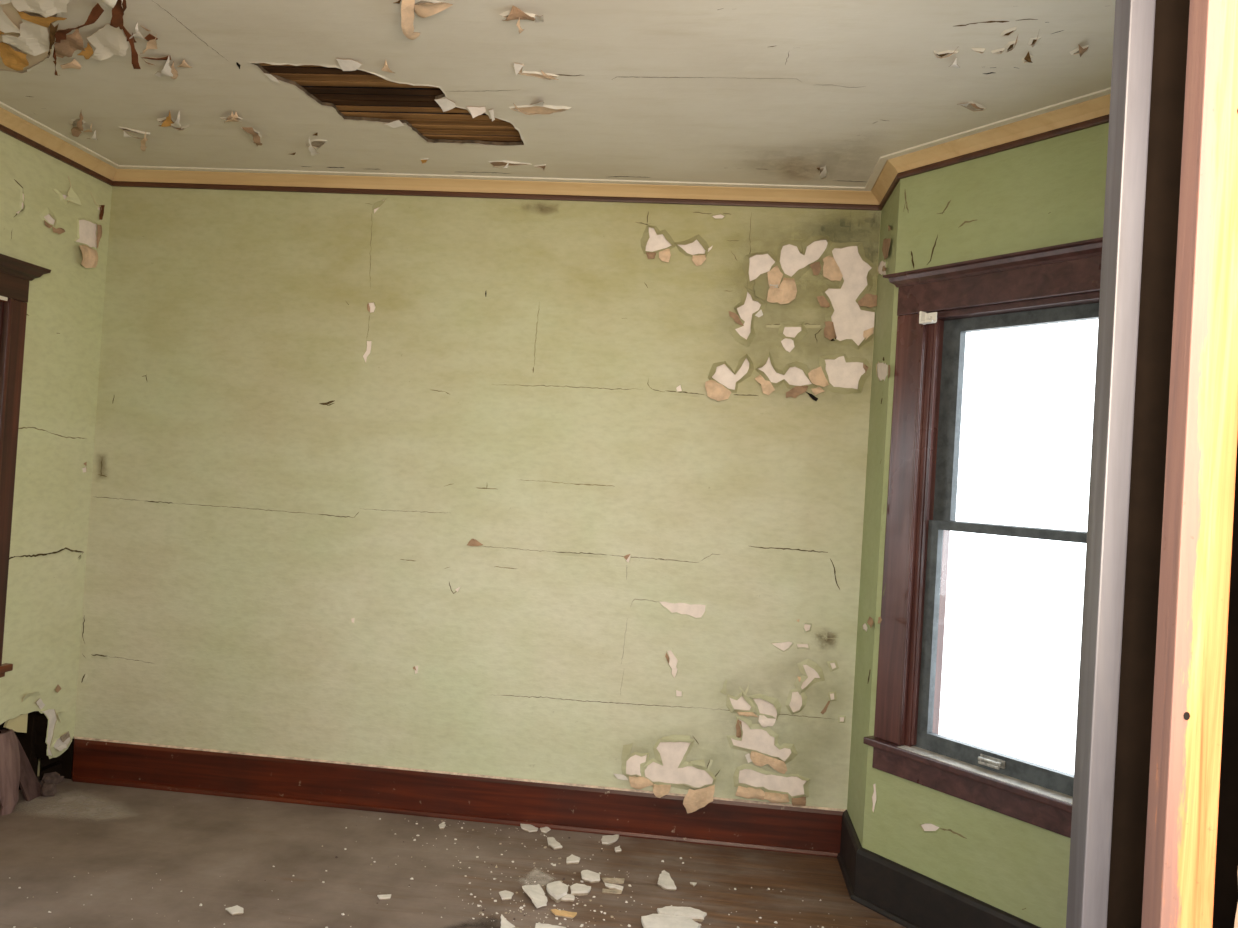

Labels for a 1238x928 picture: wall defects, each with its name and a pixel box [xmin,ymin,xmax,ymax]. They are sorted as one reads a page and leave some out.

peeling [0,0,192,79]
spalling [247,58,571,146]
peeling [640,225,712,266]
crack [908,235,938,270]
peeling [705,225,891,401]
crack [102,480,612,518]
crack [9,547,83,560]
crack [750,546,840,591]
crack [484,546,730,711]
spalling [0,692,74,780]
peeling [613,735,716,813]
peeling [720,619,846,806]